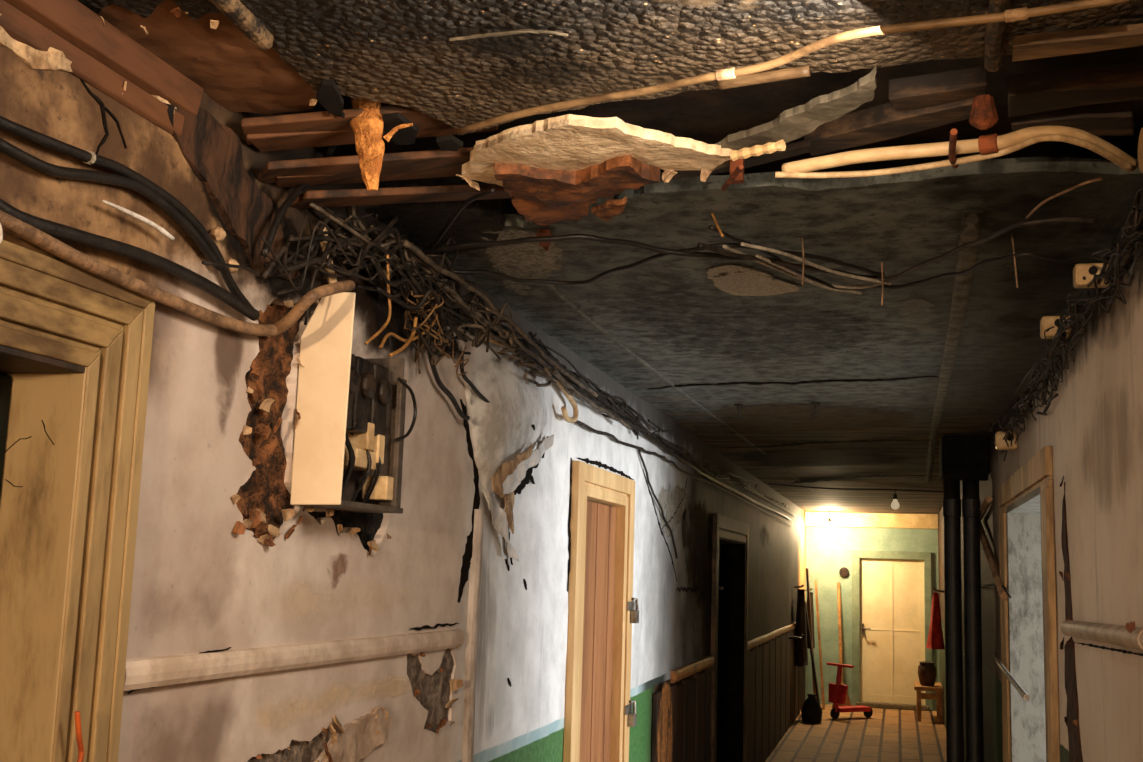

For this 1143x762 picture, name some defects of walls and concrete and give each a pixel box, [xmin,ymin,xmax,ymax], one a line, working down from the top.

flaking render [0,13,73,72]
peeling [456,66,877,191]
peeling [591,196,627,222]
flaking render [231,300,392,556]
crack [409,399,480,631]
crack [514,436,702,592]
peeling [247,715,345,762]
peeling [407,645,463,733]